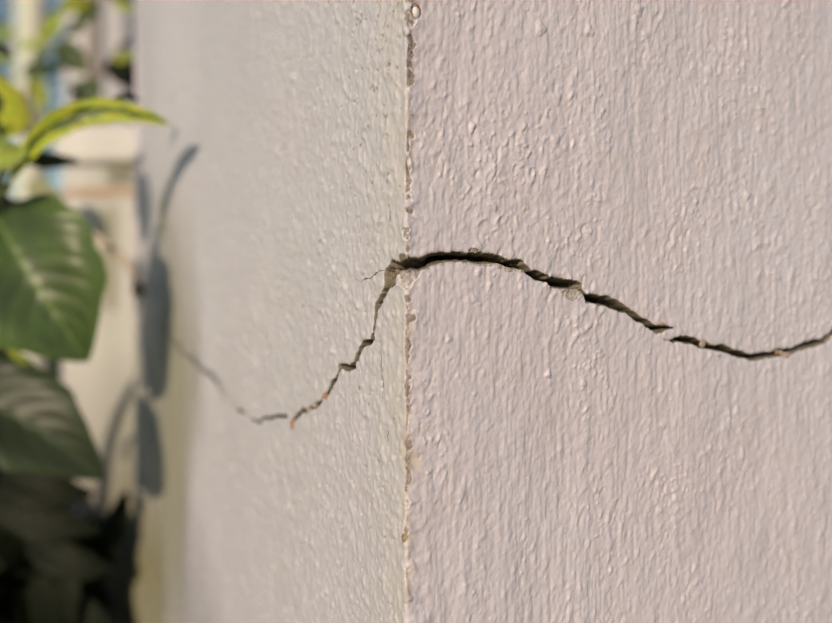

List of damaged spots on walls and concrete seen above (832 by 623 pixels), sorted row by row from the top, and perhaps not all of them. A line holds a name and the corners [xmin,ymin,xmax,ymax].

crack [151,248,832,430]